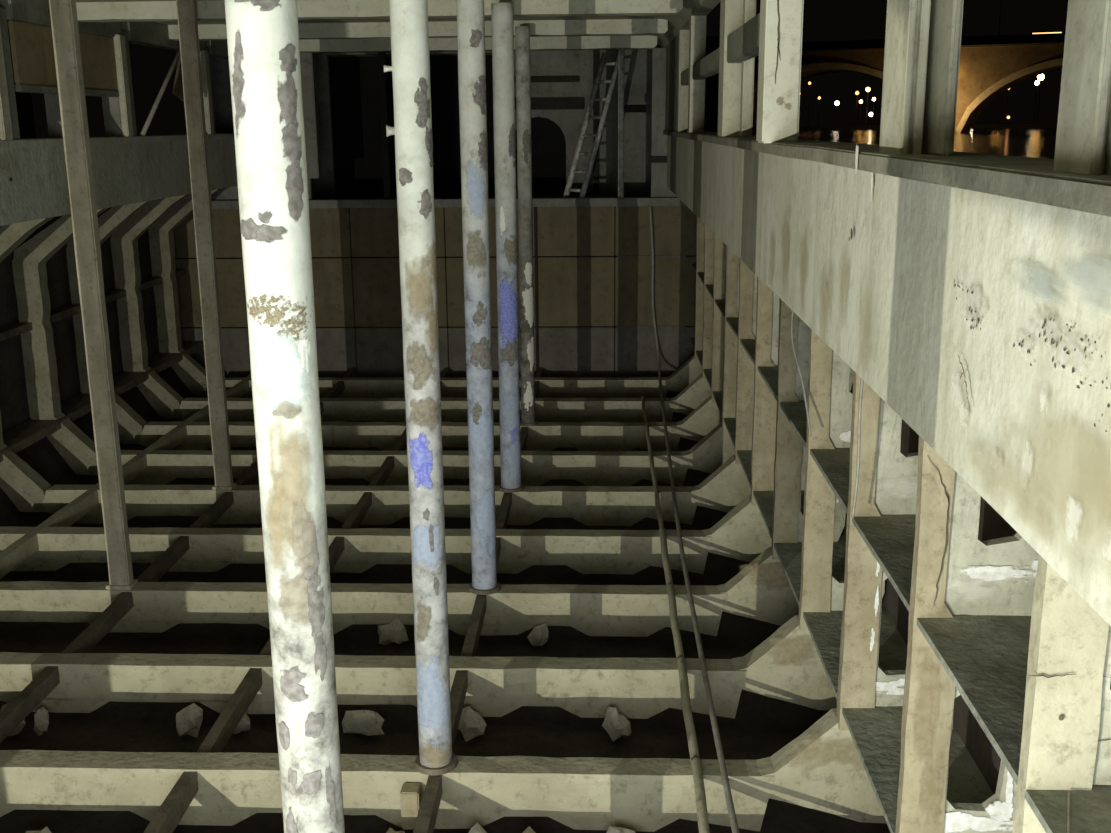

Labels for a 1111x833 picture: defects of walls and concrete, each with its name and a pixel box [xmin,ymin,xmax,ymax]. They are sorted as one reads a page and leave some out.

peeling [232,32,246,135]
peeling [235,0,281,11]
peeling [241,44,304,243]
peeling [414,77,433,167]
peeling [472,76,486,115]
crack [773,0,781,83]
corrosion [247,293,307,342]
corrosion [268,437,315,571]
crack [927,455,949,602]
peeling [279,533,327,702]
peeling [305,712,324,738]
peeling [288,761,336,833]